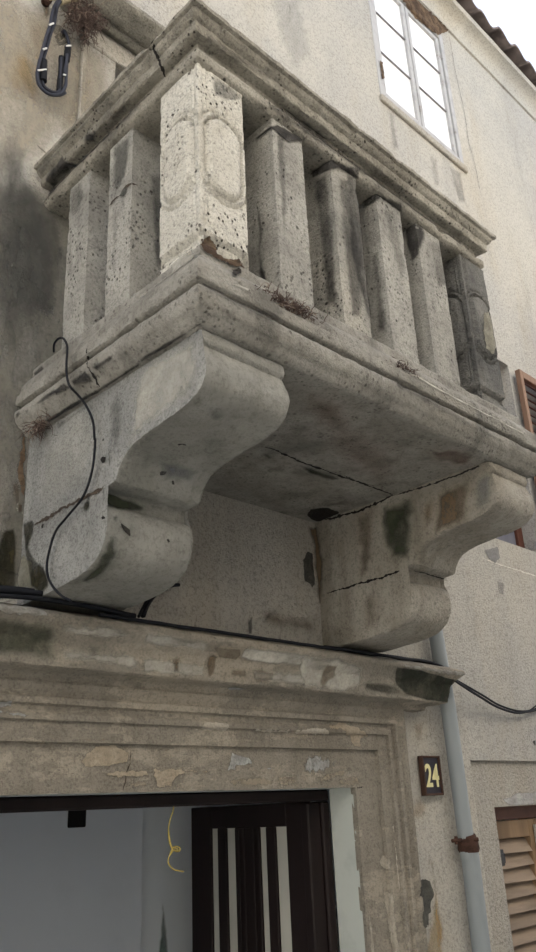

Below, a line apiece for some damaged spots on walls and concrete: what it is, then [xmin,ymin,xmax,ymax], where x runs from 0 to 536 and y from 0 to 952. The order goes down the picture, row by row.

crack [151,40,166,77]
water stain [46,157,76,187]
water stain [0,179,48,314]
crack [265,447,479,520]
water stain [437,487,465,530]
peeling [303,552,315,587]
crack [327,571,445,594]
peeling [256,722,369,747]
peeling [81,745,208,788]
peeling [420,879,434,928]